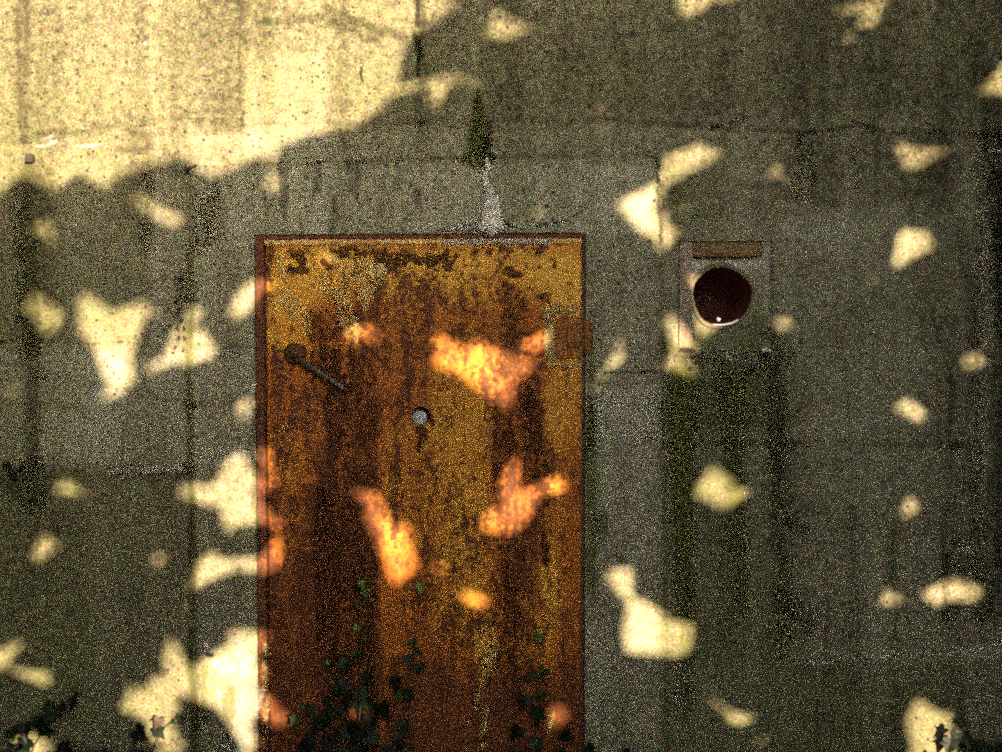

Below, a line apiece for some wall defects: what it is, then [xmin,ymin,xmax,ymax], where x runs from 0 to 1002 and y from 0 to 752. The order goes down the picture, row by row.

water stain [444,118,551,245]
water stain [4,162,38,480]
rust [285,247,310,275]
rust [320,245,514,274]
rust [531,243,556,268]
rust [306,305,379,751]
rust [415,415,436,453]
rust [490,266,553,711]
water stain [649,353,695,616]